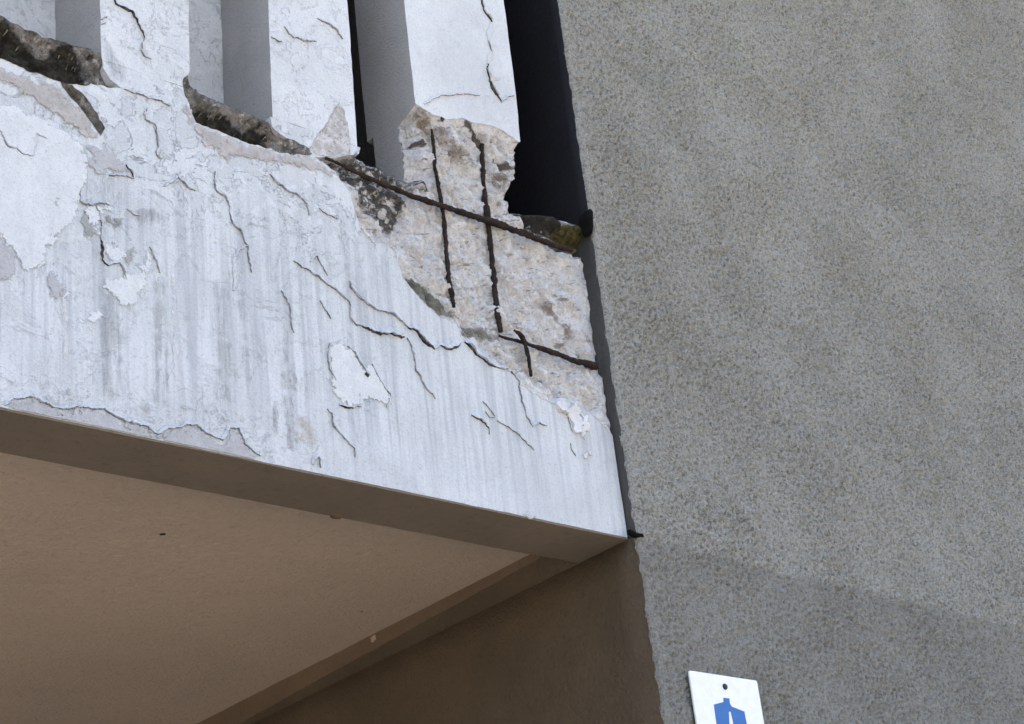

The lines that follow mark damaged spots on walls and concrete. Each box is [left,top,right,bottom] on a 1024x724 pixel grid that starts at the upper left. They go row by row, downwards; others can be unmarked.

crack [101,0,152,59]
crack [424,0,515,105]
crack [0,130,46,156]
peeling [0,15,154,309]
crack [79,190,140,280]
crack [108,88,253,291]
crack [269,173,338,219]
spalling [183,75,612,458]
corrosion [325,117,599,377]
crack [293,255,577,457]
crack [4,394,261,456]
peeling [0,374,273,458]